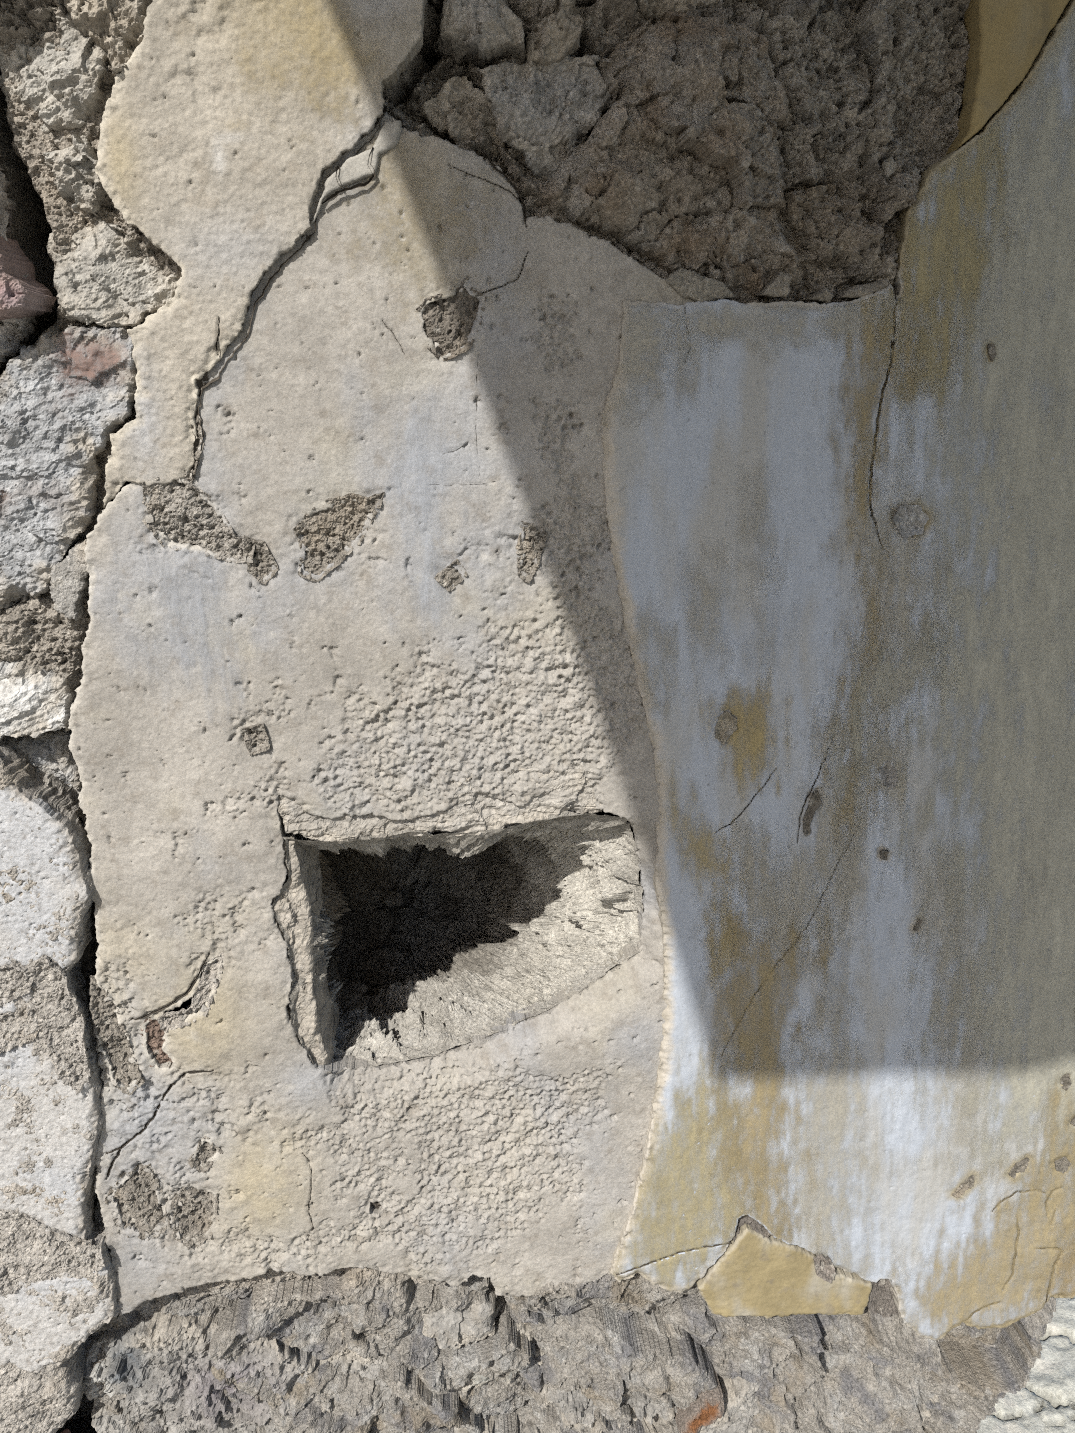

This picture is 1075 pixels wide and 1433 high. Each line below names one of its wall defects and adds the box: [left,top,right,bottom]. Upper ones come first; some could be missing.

spalling [714,0,971,304]
flaking render [95,0,427,585]
crack [189,104,388,479]
spalling [415,275,487,361]
crack [869,286,897,550]
damp [623,20,1075,1332]
crack [80,902,96,1002]
crack [94,1069,214,1220]
flaking render [696,1215,899,1319]